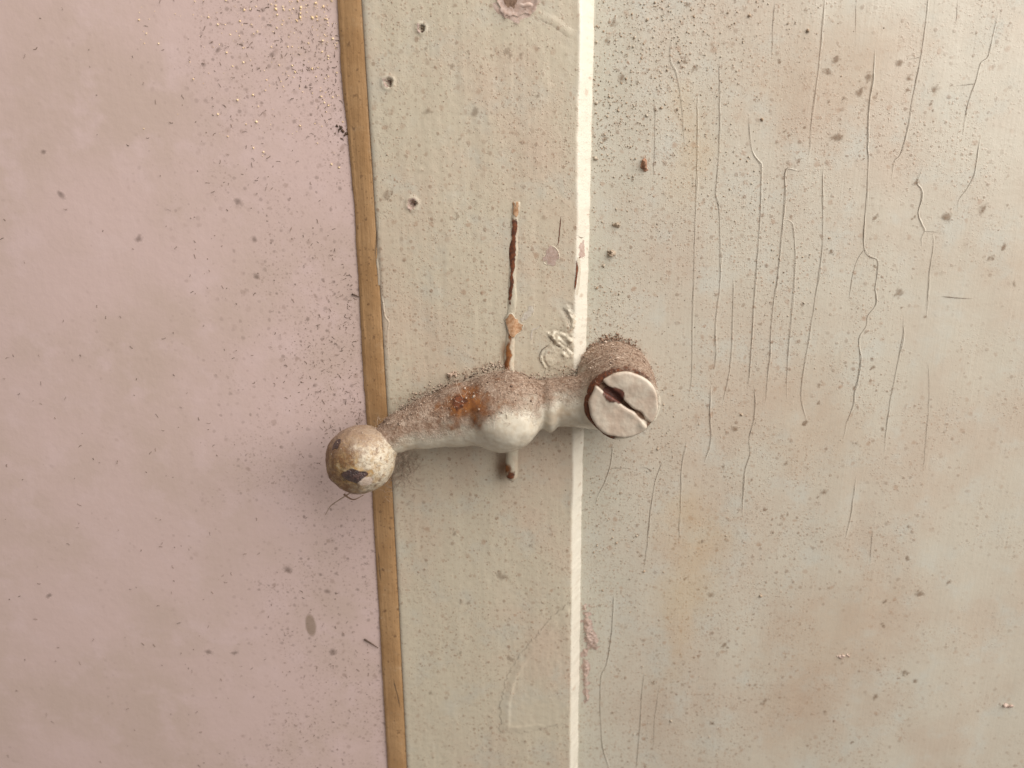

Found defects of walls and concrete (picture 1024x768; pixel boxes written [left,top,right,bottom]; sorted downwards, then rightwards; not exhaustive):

peeling [493,0,578,39]
crack [957,12,999,213]
rust [508,202,519,305]
crack [643,0,826,573]
crack [843,0,935,452]
rust [503,335,512,370]
crack [845,476,872,556]